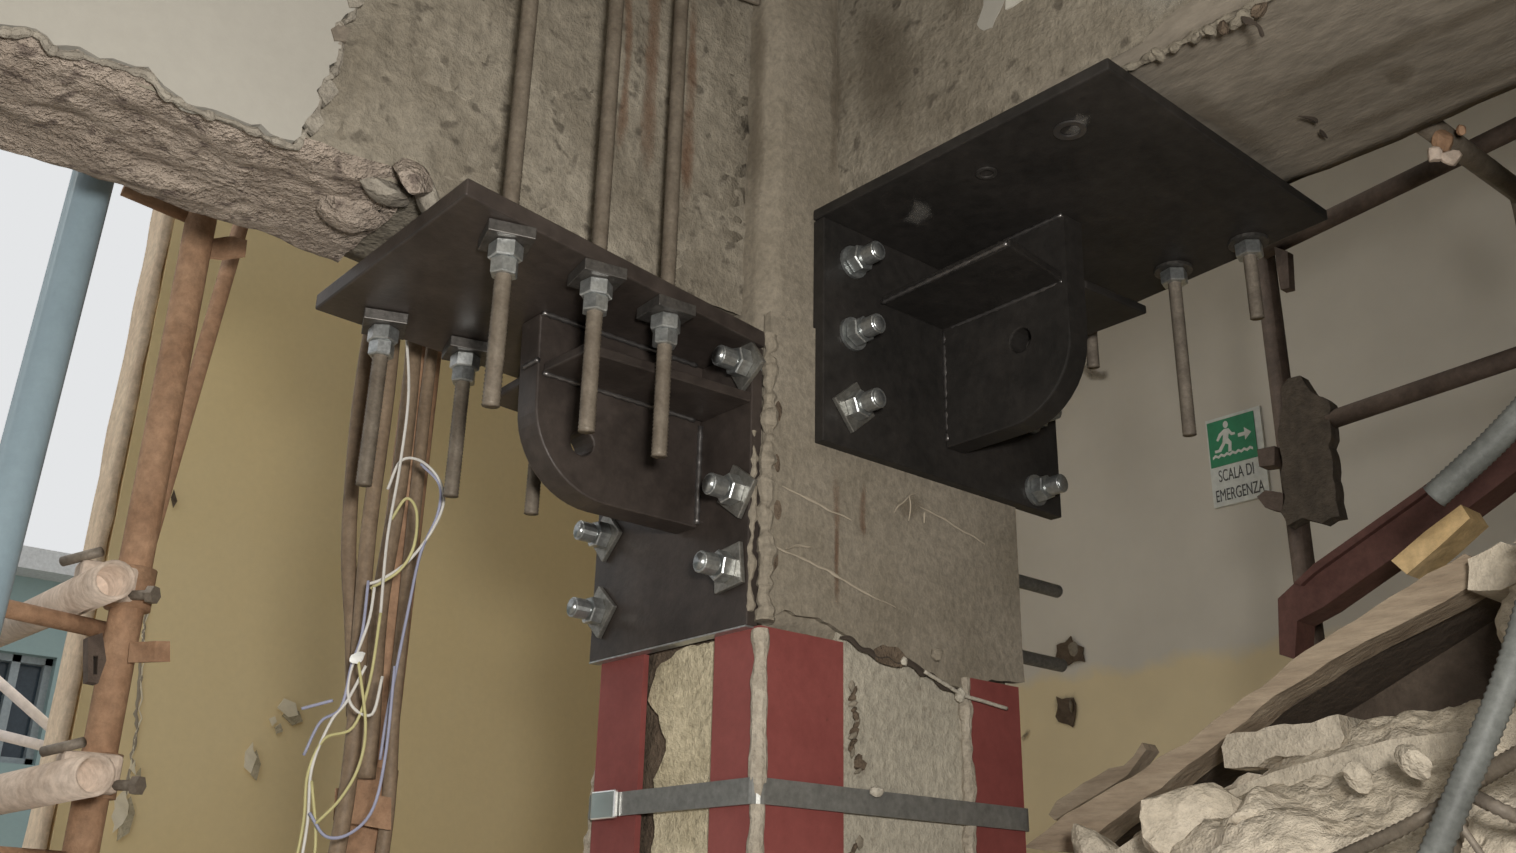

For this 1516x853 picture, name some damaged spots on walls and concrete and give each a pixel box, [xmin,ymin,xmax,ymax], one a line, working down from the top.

flaking render [977,0,1023,31]
spalling [1495,584,1516,644]
spalling [1055,636,1085,666]
spalling [1055,697,1076,727]
spalling [1170,699,1481,853]
spalling [1454,745,1516,853]